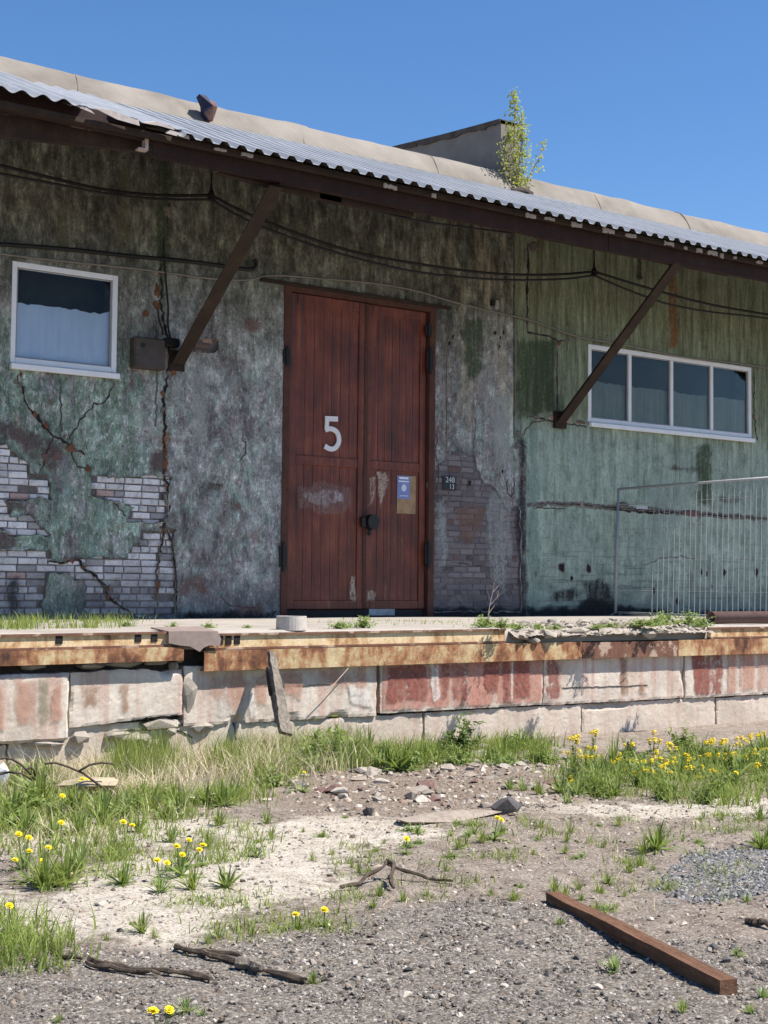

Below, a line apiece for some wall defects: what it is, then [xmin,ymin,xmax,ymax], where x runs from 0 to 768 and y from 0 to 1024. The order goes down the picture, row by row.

crack [13,372,115,477]
flaking render [0,424,207,619]
crack [48,203,178,617]
flaking render [427,452,715,639]
leakage [433,341,712,617]
crack [614,508,676,516]
corrosion [376,660,561,711]
corrosion [692,653,767,695]